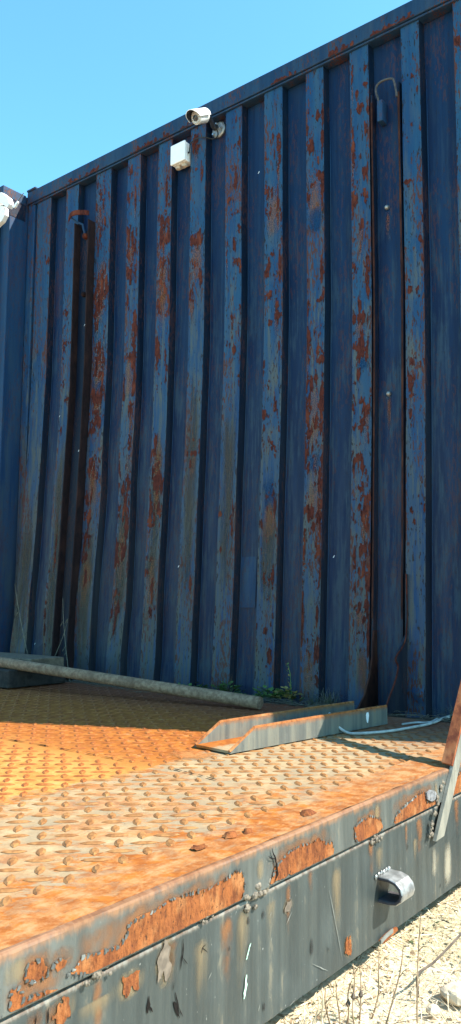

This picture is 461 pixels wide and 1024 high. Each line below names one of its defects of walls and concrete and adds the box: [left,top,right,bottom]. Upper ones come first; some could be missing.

rust [65,165,109,439]
rust [81,456,100,589]
rust [114,223,139,570]
rust [147,433,164,533]
rust [156,170,170,317]
rust [172,254,387,759]
rust [306,103,324,211]
rust [328,41,375,690]
rust [389,69,426,619]
rust [222,828,253,839]